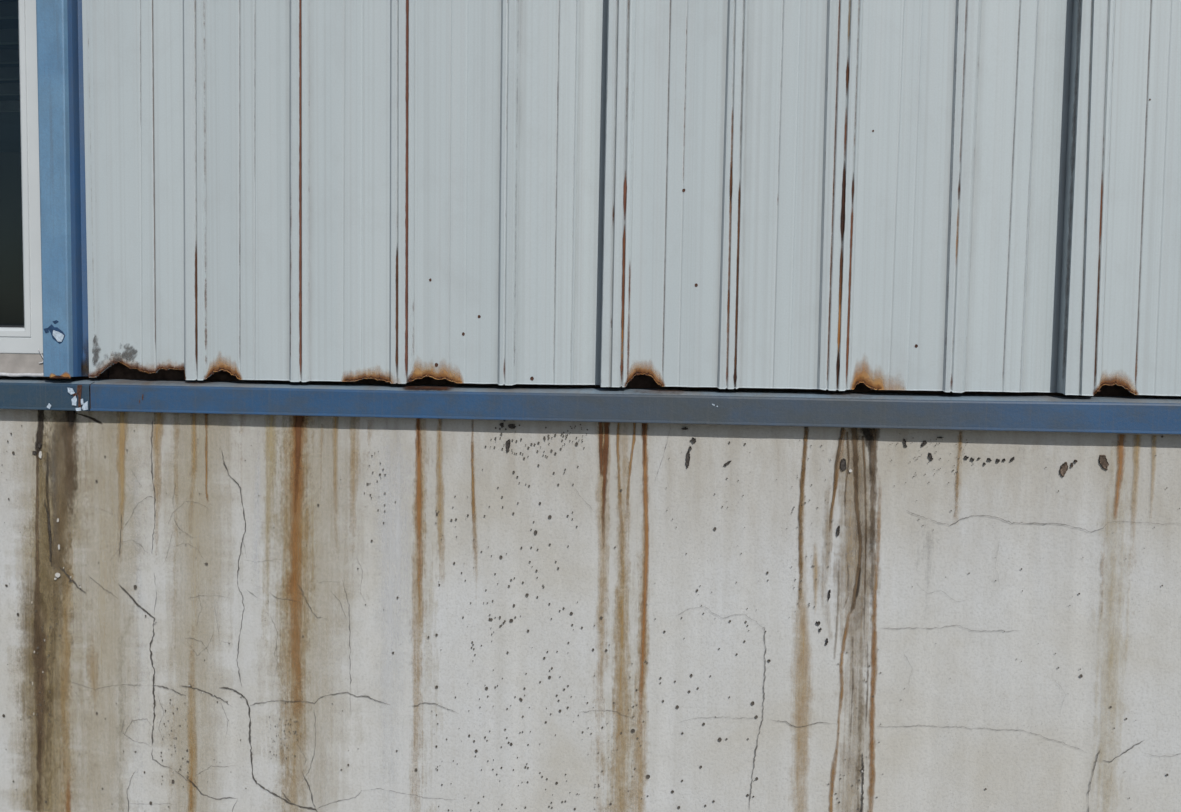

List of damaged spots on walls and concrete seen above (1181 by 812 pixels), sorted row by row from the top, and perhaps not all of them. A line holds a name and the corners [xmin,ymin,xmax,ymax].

corrosion [89,247,241,380]
corrosion [342,0,463,390]
corrosion [613,175,664,386]
corrosion [827,0,886,390]
corrosion [1093,181,1137,396]
water stain [23,410,101,812]
crack [149,420,157,549]
crack [44,453,453,812]
corrosion [599,422,649,692]
corrosion [798,427,880,812]
crack [858,754,866,812]
crack [1088,743,1140,812]